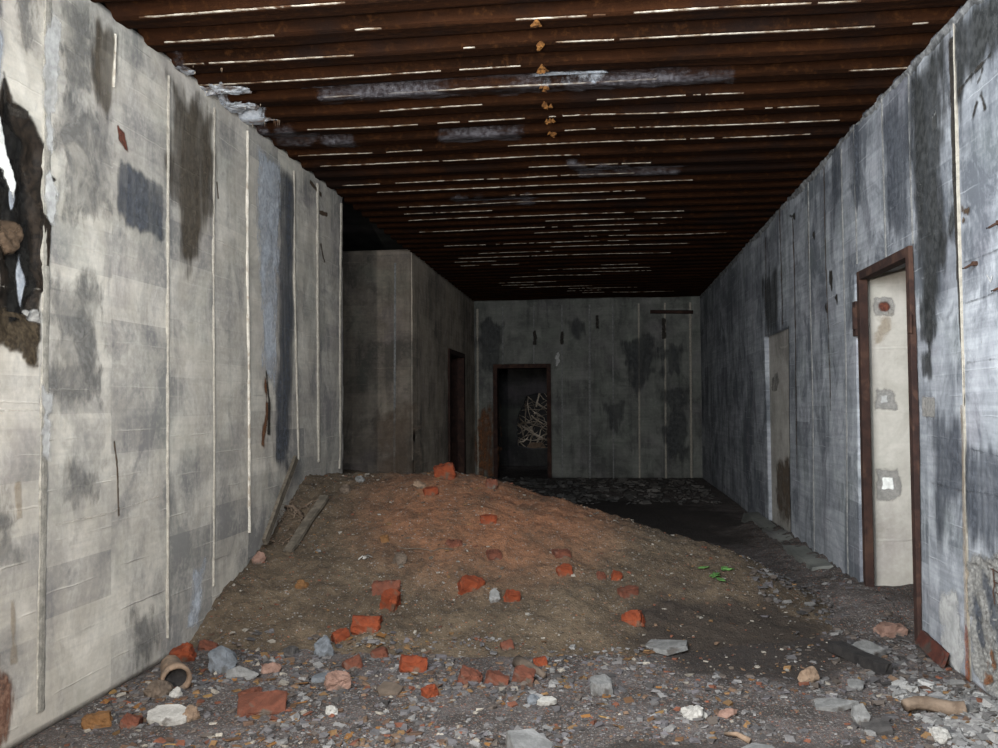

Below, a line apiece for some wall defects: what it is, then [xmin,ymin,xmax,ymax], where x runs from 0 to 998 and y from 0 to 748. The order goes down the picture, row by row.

damp [18,0,33,48]
damp [164,35,274,43]
damp [139,2,345,18]
damp [634,0,861,14]
spalling [43,17,61,150]
damp [56,8,117,214]
damp [118,55,744,263]
spalling [45,171,58,223]
damp [299,118,840,293]
damp [938,209,954,262]
damp [922,345,931,377]
spalling [965,553,998,700]